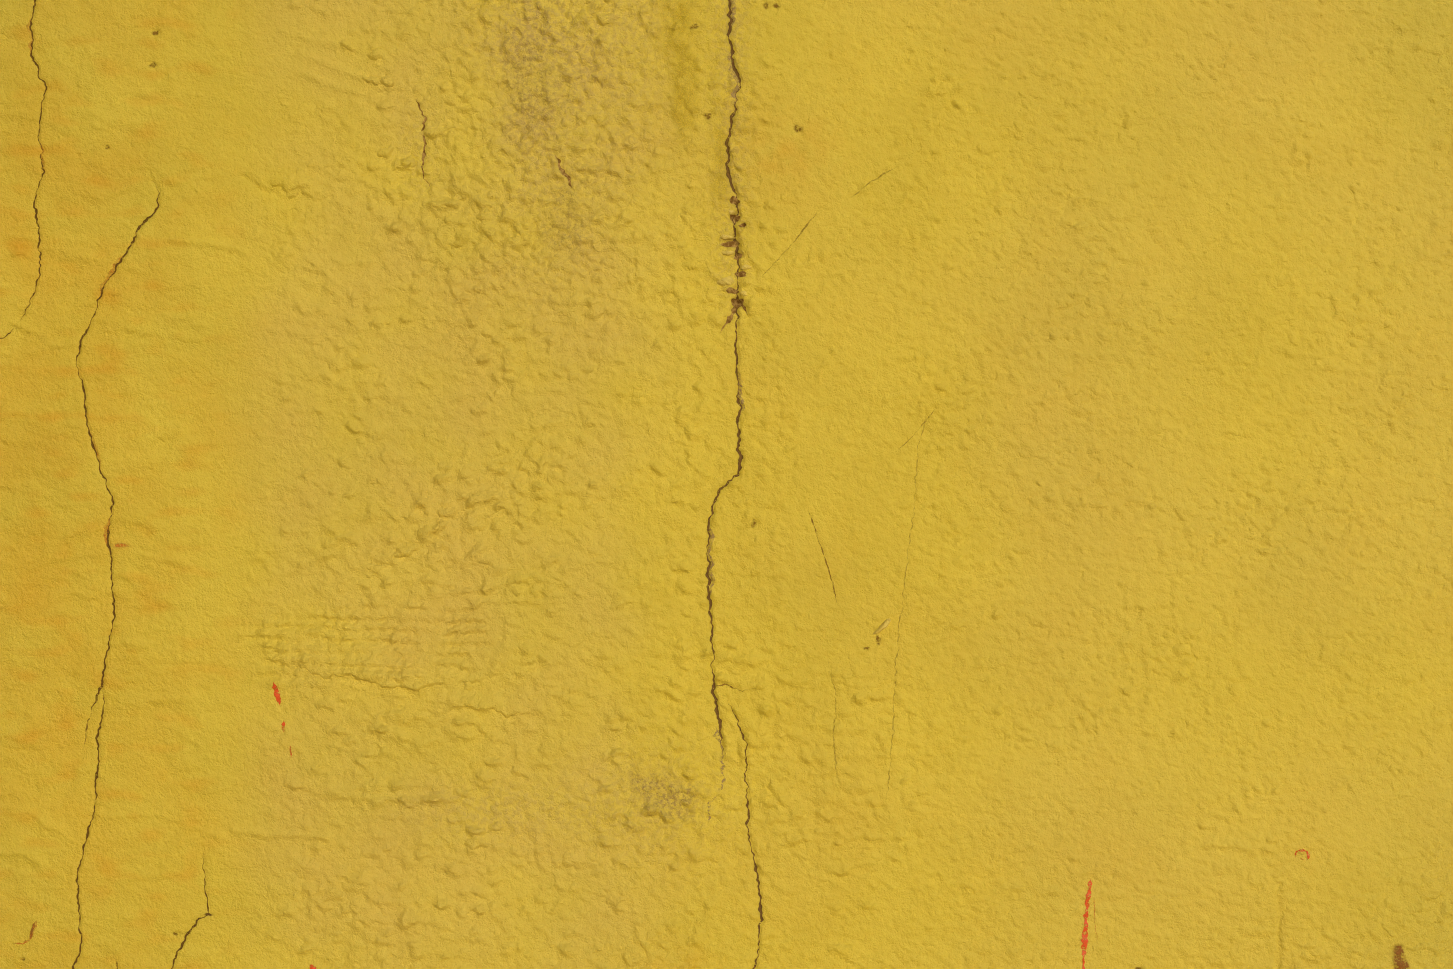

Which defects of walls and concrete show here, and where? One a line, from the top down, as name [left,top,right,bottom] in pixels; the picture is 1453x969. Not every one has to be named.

crack [0,0,47,339]
crack [72,181,160,969]
crack [171,853,212,969]
crack [705,0,764,969]